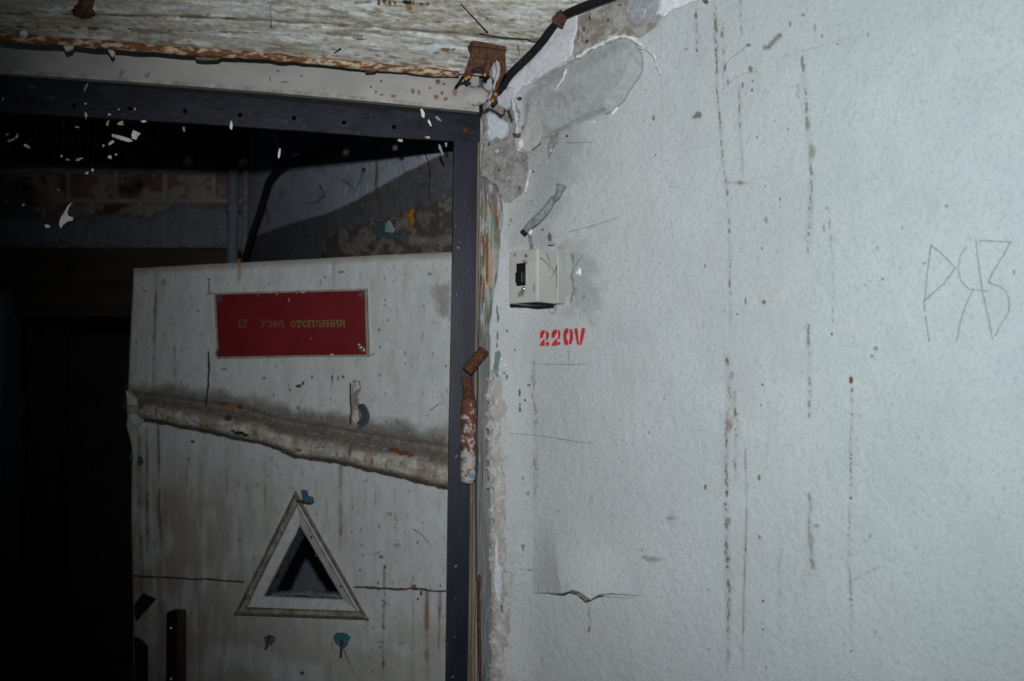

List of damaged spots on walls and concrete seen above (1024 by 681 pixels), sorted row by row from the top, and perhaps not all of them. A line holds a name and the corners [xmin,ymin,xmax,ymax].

rust [0,30,487,100]
flaking render [559,0,662,75]
flaking render [248,109,453,262]
flaking render [480,86,586,681]